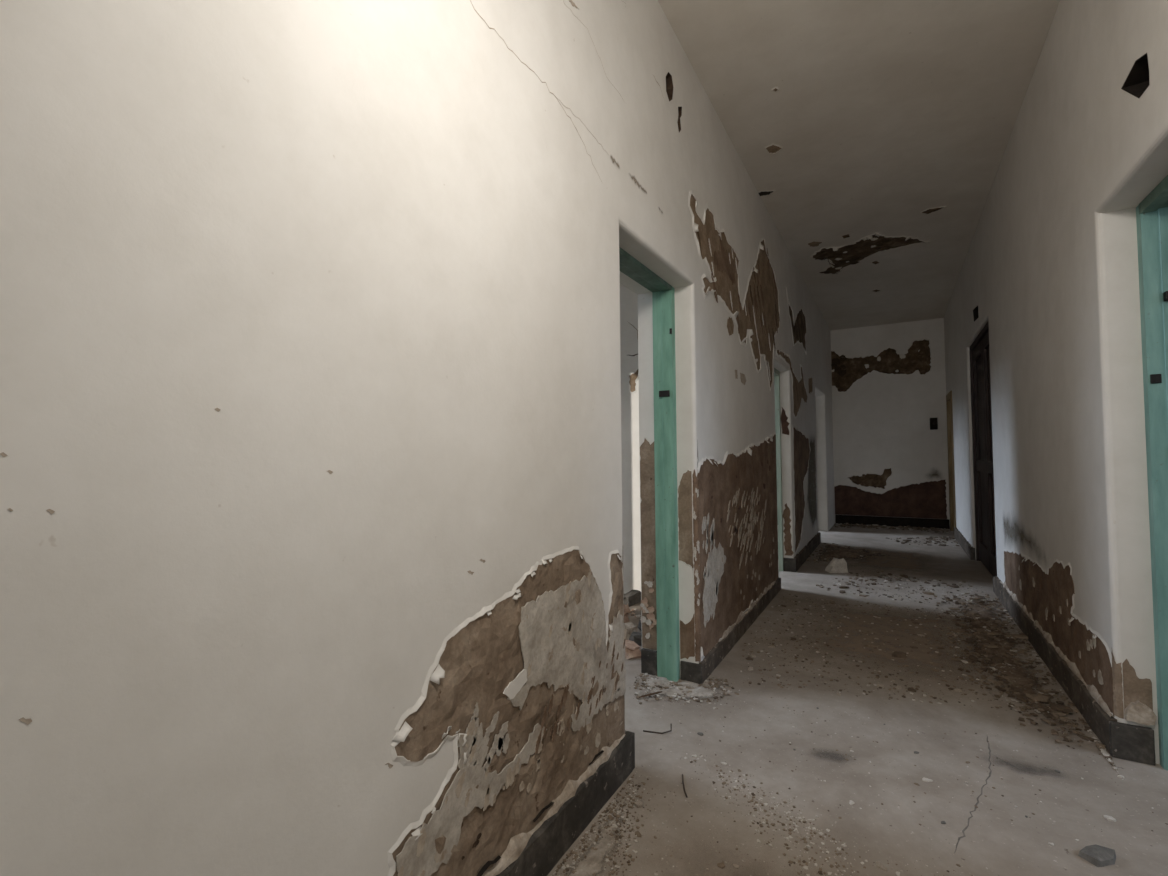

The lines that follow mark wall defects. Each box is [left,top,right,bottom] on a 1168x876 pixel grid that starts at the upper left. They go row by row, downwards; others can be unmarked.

crack [470,0,602,180]
spalling [666,72,682,132]
spalling [1121,53,1149,98]
flaking render [808,232,930,275]
peeling [831,338,933,393]
peeling [678,190,813,662]
flaking render [834,467,948,519]
peeling [385,439,657,876]
peeling [1004,549,1157,726]